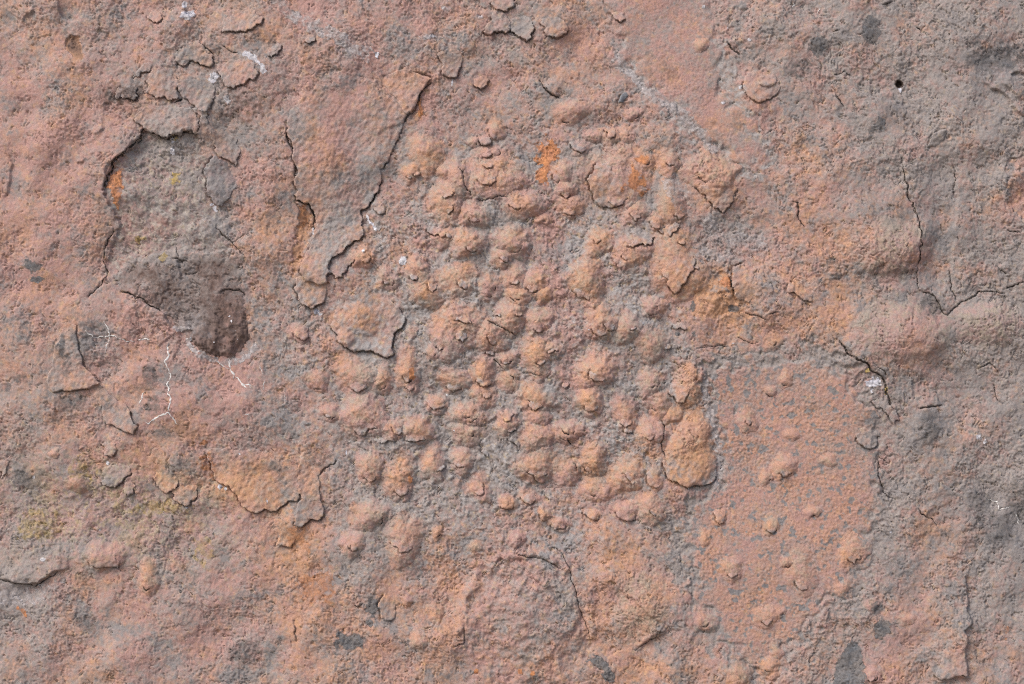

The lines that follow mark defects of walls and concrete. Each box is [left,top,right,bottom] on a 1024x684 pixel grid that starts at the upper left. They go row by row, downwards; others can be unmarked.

corrosion [106,170,124,209]
spalling [103,42,259,358]
peeling [286,50,463,308]
corrosion [534,134,561,185]
crack [902,152,1022,316]
crack [840,342,941,414]
peeling [662,456,717,488]